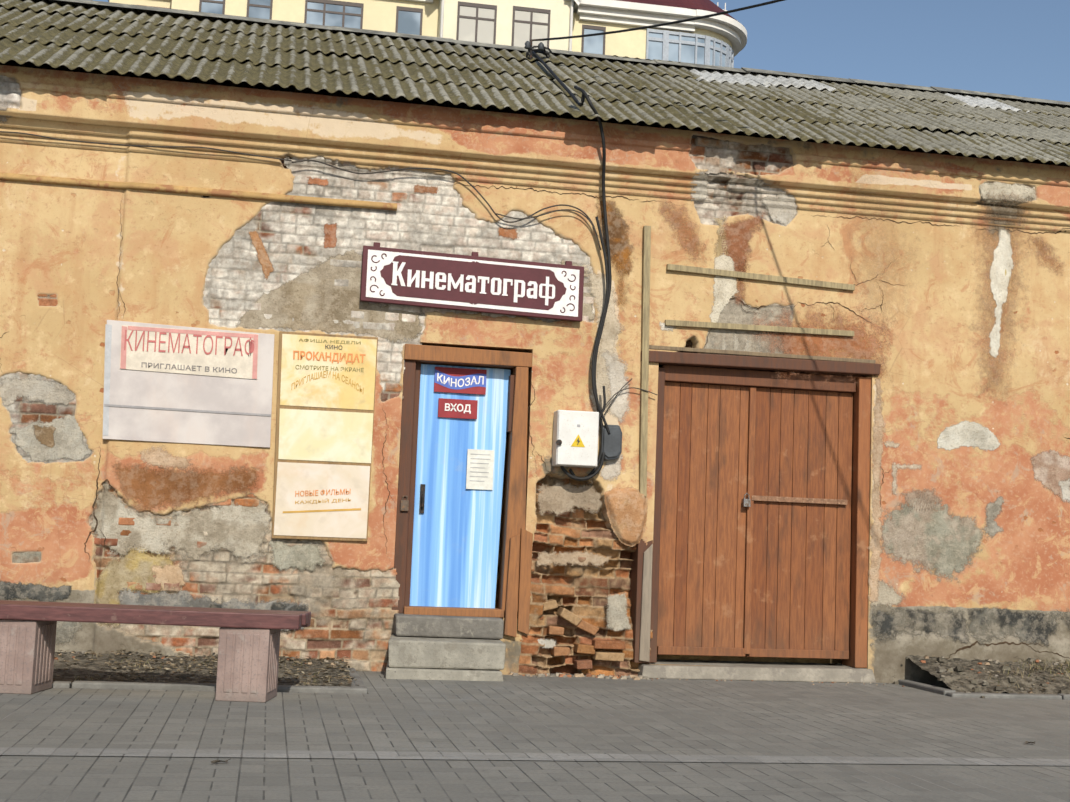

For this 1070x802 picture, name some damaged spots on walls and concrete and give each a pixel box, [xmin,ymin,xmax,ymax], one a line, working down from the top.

flaking render [203,156,629,422]
flaking render [701,216,794,358]
peeling [989,229,1014,357]
flaking render [0,372,92,464]
peeling [0,581,72,602]
peeling [55,621,81,644]
flaking render [89,482,400,672]
flaking render [518,454,653,676]
peeling [868,378,1070,646]